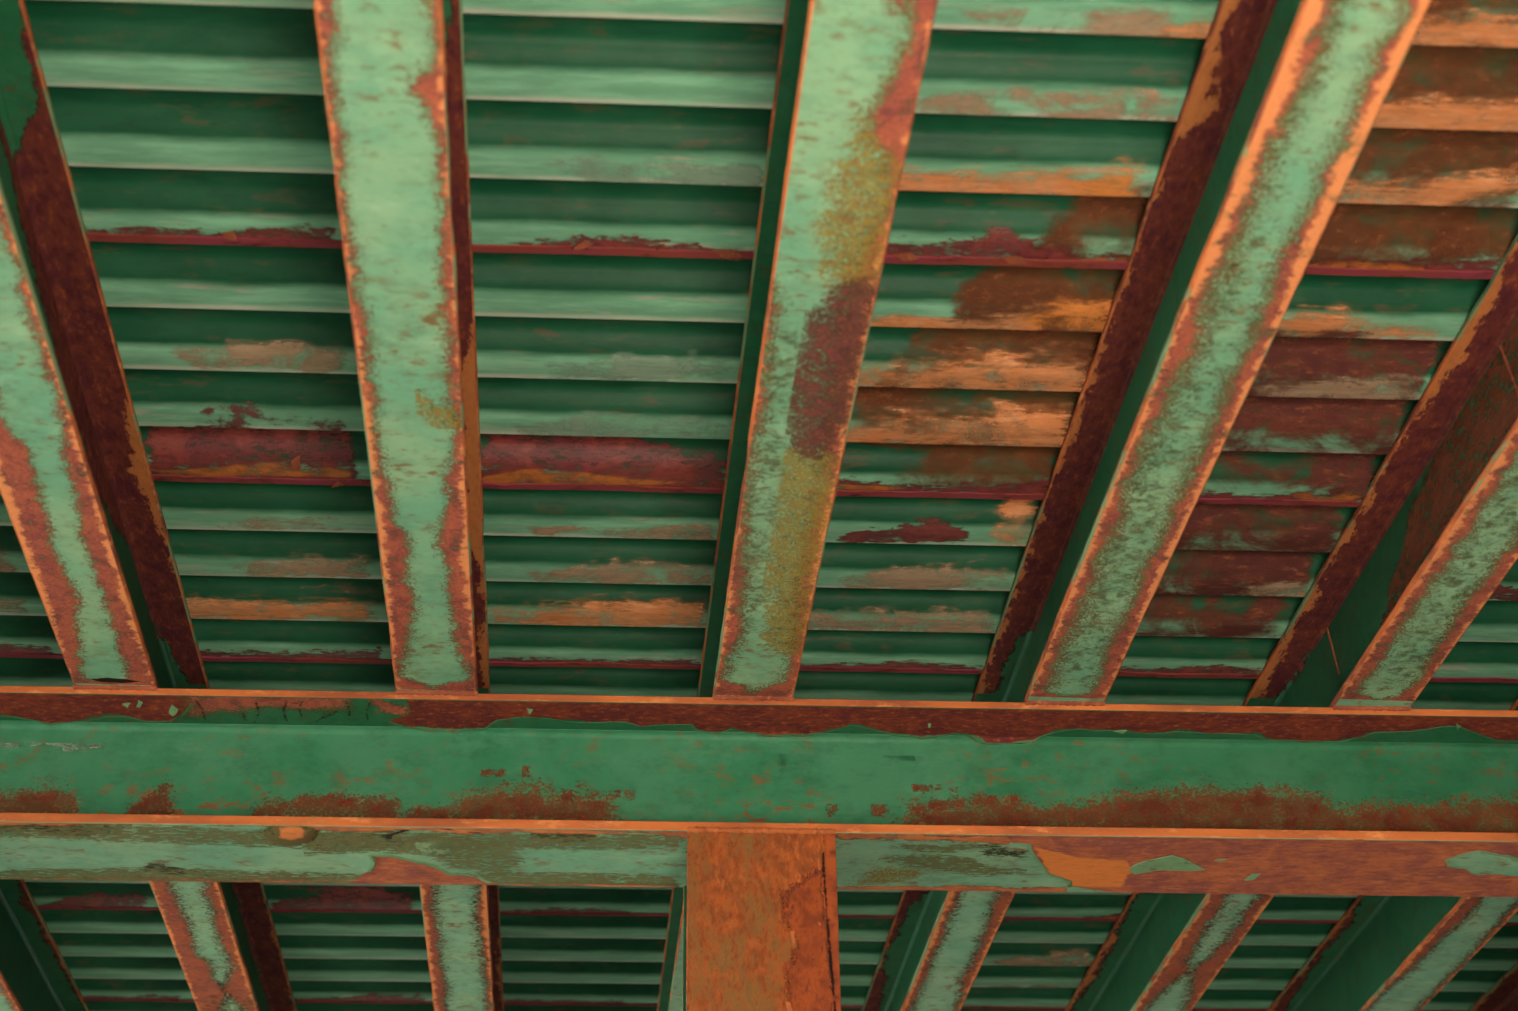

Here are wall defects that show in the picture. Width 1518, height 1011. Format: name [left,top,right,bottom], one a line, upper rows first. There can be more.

corrosion [659,163,764,187]
corrosion [715,0,1278,697]
corrosion [1029,0,1518,701]
peeling [0,693,194,753]
corrosion [0,776,177,827]
corrosion [207,766,687,838]
corrosion [825,775,1518,845]
peeling [932,835,1518,897]
peeling [688,833,827,1011]